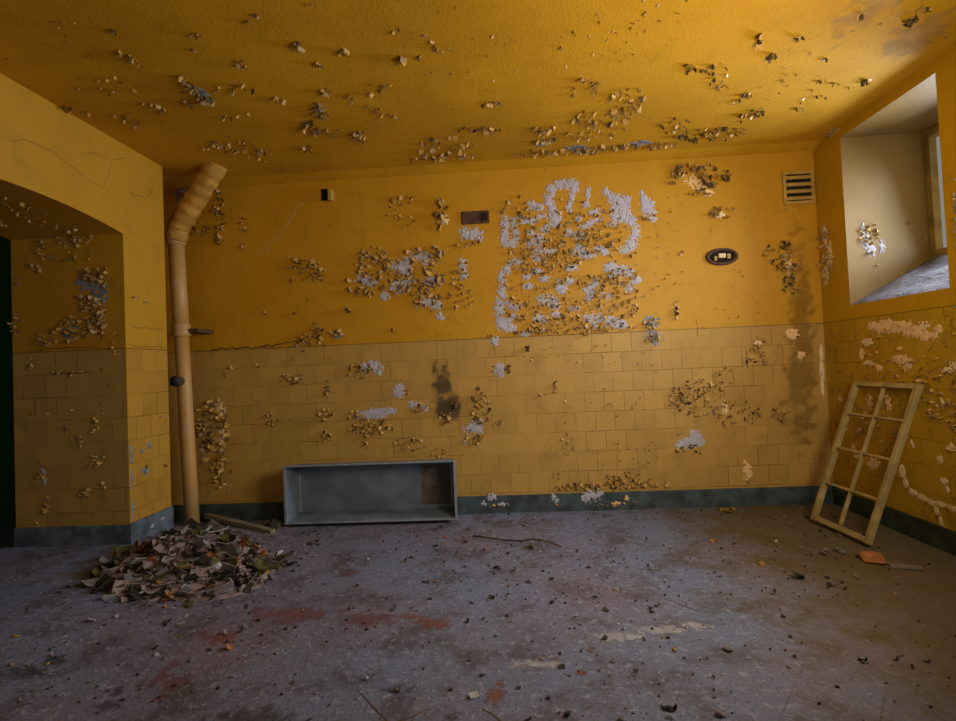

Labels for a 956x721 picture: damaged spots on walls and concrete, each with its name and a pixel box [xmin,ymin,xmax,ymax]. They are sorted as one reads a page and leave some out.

peeling [514,33,797,160]
peeling [410,126,501,164]
peeling [669,162,734,219]
peeling [2,197,116,354]
peeling [347,226,484,321]
peeling [488,178,679,364]
peeling [762,239,802,294]
peeling [195,398,233,489]
peeling [349,383,503,458]
peeling [675,429,706,454]
peeling [838,318,956,470]
peeling [898,464,956,528]